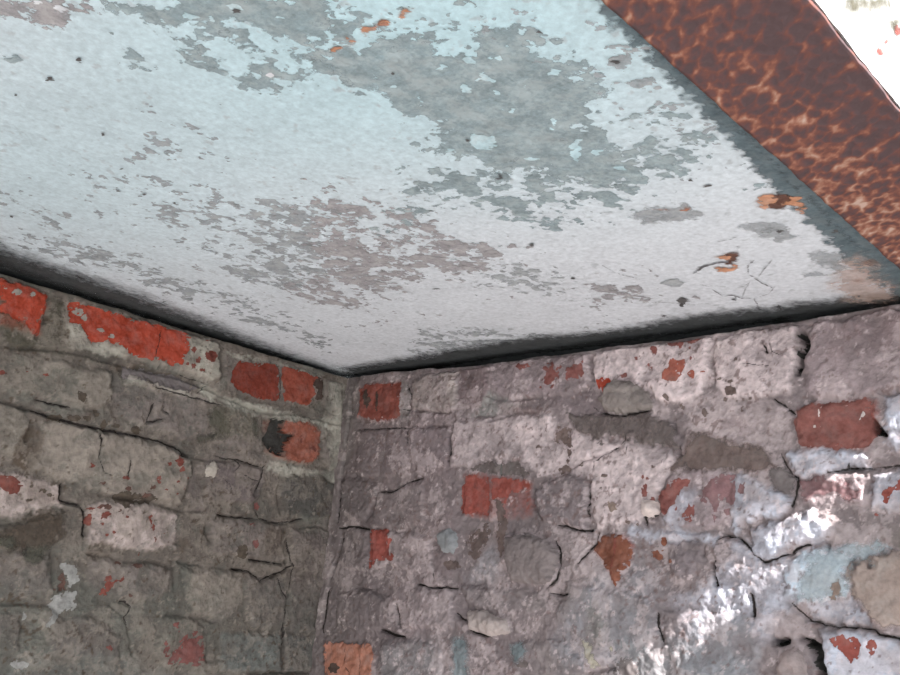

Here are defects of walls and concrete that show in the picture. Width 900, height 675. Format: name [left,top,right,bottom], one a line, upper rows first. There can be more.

peeling [0,0,720,356]
corrosion [757,194,807,214]
corrosion [714,252,739,272]
peeling [67,302,218,393]
spalling [230,361,323,406]
crack [30,375,220,476]
peeling [794,397,888,451]
crack [58,484,84,537]
crack [338,493,370,542]
peeling [461,460,530,560]
crack [216,456,301,645]
crack [715,536,812,587]